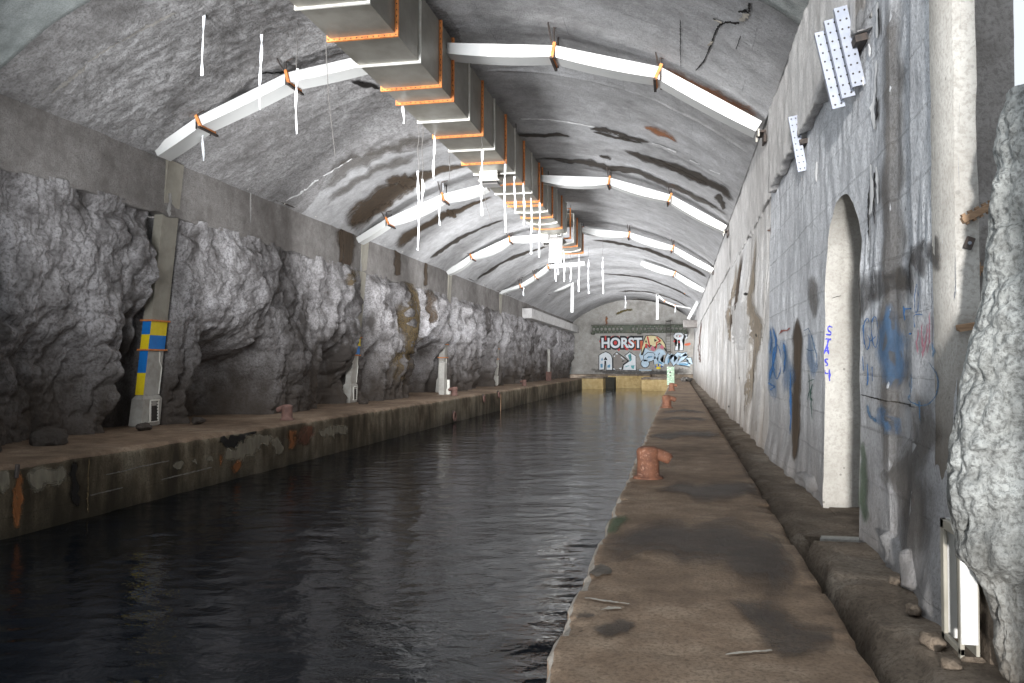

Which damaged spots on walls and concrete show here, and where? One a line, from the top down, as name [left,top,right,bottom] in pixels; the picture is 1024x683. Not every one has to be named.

crack [680,3,751,70]
damp [328,138,466,271]
damp [541,127,731,211]
corrosion [645,127,676,141]
damp [792,319,802,460]
corrosion [12,474,24,527]